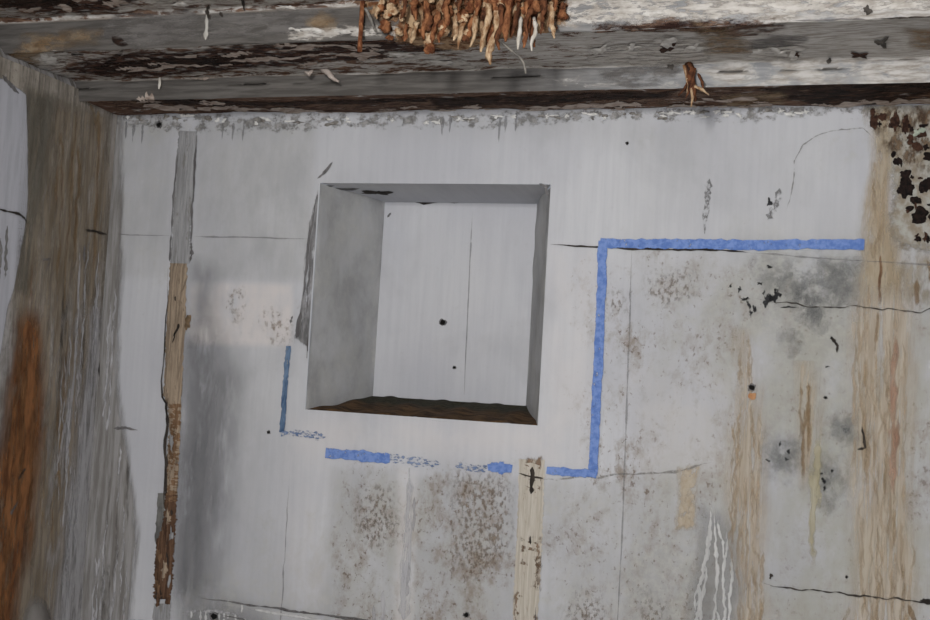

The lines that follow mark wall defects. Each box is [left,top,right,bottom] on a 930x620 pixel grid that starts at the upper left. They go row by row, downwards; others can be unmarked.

peeling [566,0,930,24]
peeling [289,25,398,40]
corrosion [10,32,456,80]
flaking render [117,109,642,132]
corrosion [113,82,930,252]
leakage [728,282,800,316]
crack [756,298,930,313]
leakage [853,111,916,620]
corrosion [0,316,43,620]
leakage [693,502,734,620]
crack [762,574,930,605]
crack [204,598,366,620]